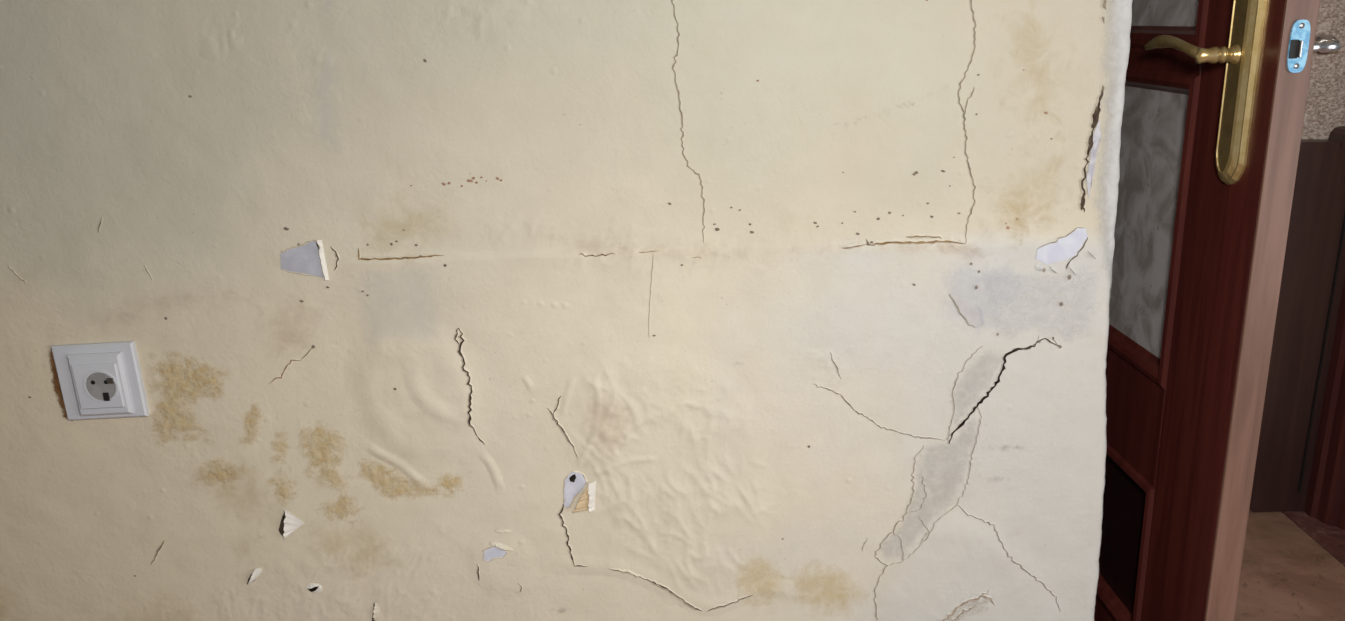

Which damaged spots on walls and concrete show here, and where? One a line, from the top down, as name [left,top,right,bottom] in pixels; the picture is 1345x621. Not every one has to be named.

crack [671,0,706,242]
crack [865,0,977,246]
peeling [1035,85,1105,280]
peeling [280,240,340,280]
crack [358,248,444,261]
crack [454,328,485,444]
peeling [279,509,304,539]
damp [304,428,349,516]
damp [363,466,459,497]
crack [557,504,588,567]
peeling [563,471,596,512]
crack [816,336,1060,621]